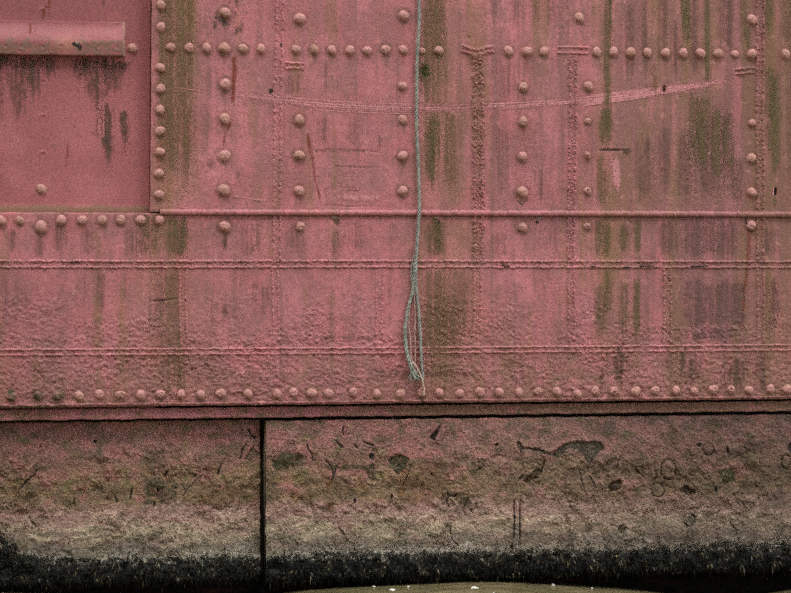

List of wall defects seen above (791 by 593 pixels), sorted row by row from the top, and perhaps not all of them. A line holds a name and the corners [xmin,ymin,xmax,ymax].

leakage [0,53,55,114]
leakage [74,58,130,161]
leakage [238,0,741,202]
leakage [621,281,640,334]
peeling [389,455,409,474]
peeling [517,441,612,512]
leakage [0,530,253,585]
leakage [272,533,791,561]